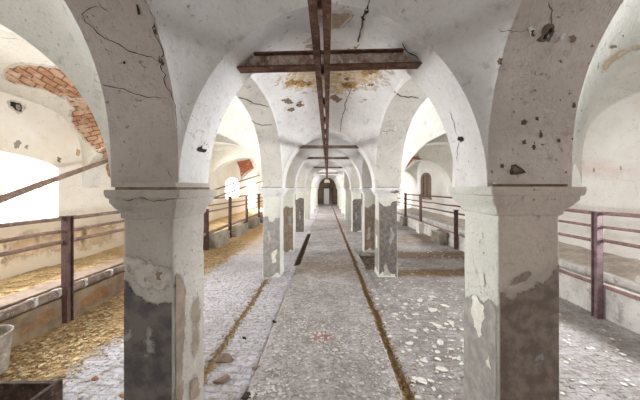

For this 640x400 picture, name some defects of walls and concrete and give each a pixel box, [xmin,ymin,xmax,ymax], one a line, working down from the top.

crack [81,4,157,61]
crack [357,0,370,47]
spalling [499,2,577,43]
flaking render [0,62,111,178]
crack [238,97,272,126]
damp [275,70,394,112]
spalling [500,161,528,178]
damp [353,199,378,271]
damp [124,273,201,400]
peeling [464,265,559,400]